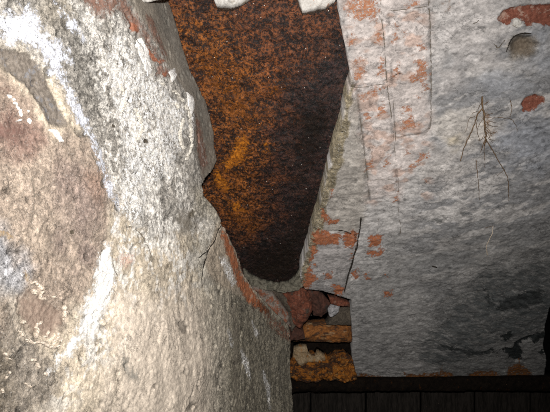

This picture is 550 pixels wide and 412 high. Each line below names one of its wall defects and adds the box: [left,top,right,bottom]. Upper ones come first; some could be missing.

peeling [344,0,380,21]
flaking render [497,4,550,28]
peeling [410,59,431,91]
flaking render [521,94,545,112]
corrosion [215,136,249,192]
crack [199,226,221,280]
flaking render [302,208,358,296]
crack [338,218,362,292]
flaking render [366,234,384,257]
leakage [419,264,550,365]
corrosion [290,348,388,383]